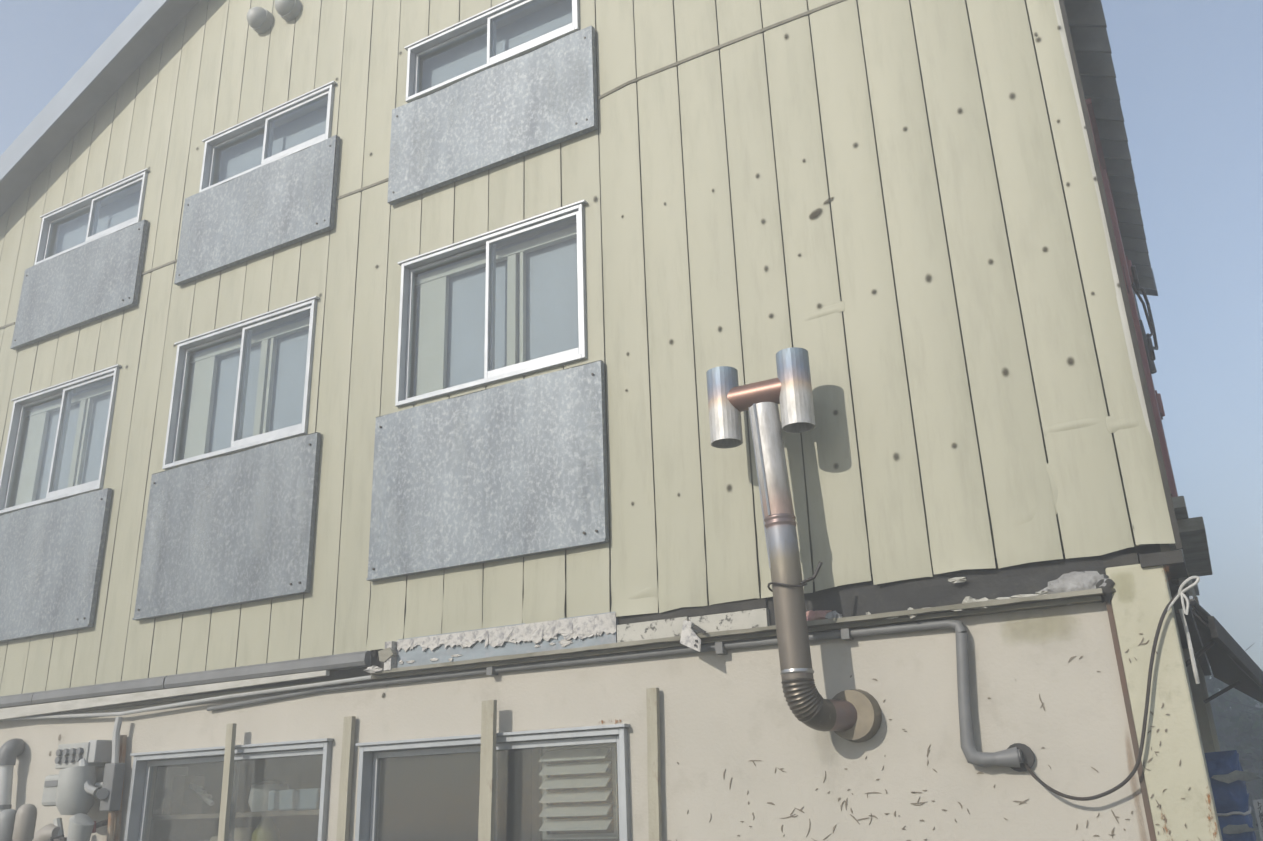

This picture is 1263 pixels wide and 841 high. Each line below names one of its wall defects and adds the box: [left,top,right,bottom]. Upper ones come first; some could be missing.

peeling [804,553,1106,619]
peeling [384,596,776,671]